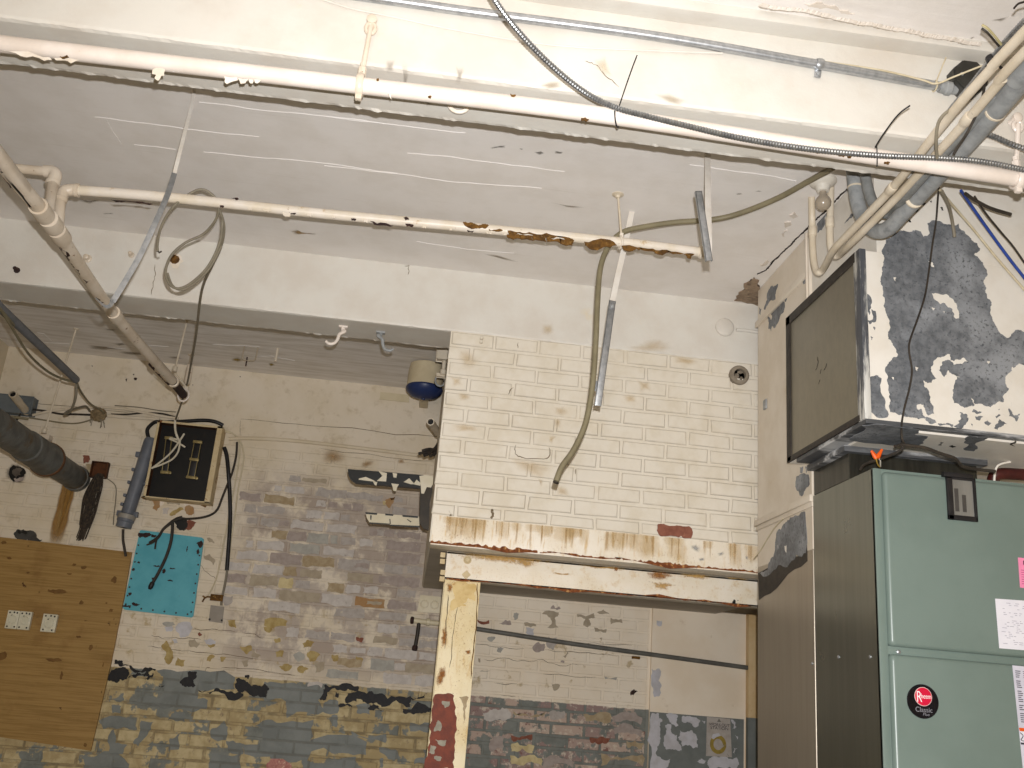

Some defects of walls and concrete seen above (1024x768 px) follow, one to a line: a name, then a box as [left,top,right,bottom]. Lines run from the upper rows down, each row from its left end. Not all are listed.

peeling [2,50,79,63]
corrosion [463,222,573,241]
corrosion [586,239,617,250]
corrosion [634,246,694,256]
spalling [734,278,787,329]
peeling [849,201,1024,451]
corrosion [430,540,758,607]
peeling [760,512,807,577]
peeling [209,471,469,768]
peeling [477,605,568,663]
peeling [83,622,261,768]
peeling [583,711,705,768]